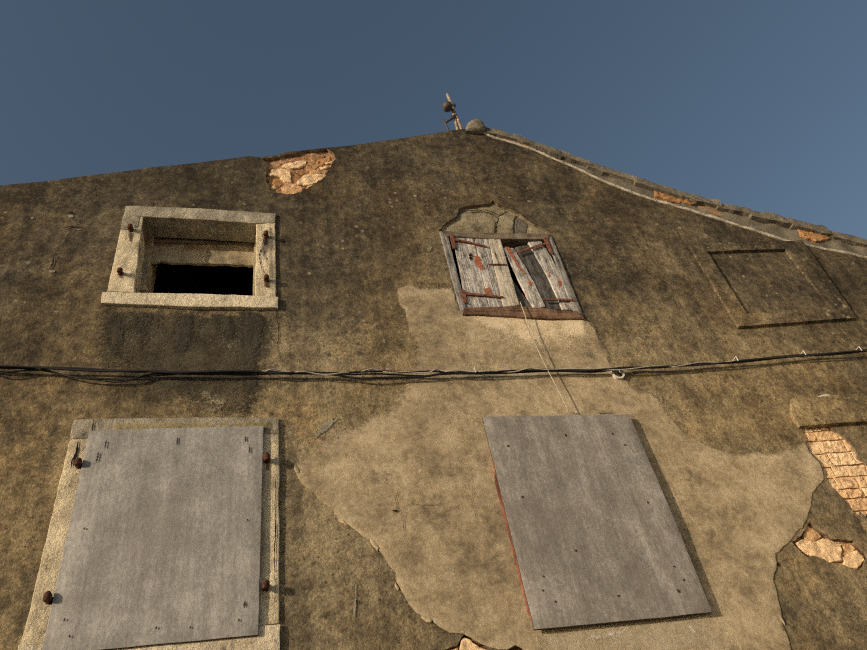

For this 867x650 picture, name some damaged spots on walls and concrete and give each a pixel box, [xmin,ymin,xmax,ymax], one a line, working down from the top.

spalling [266,152,335,194]
leakage [98,311,274,414]
spalling [802,428,867,517]
spalling [793,524,865,570]
spalling [449,637,488,650]